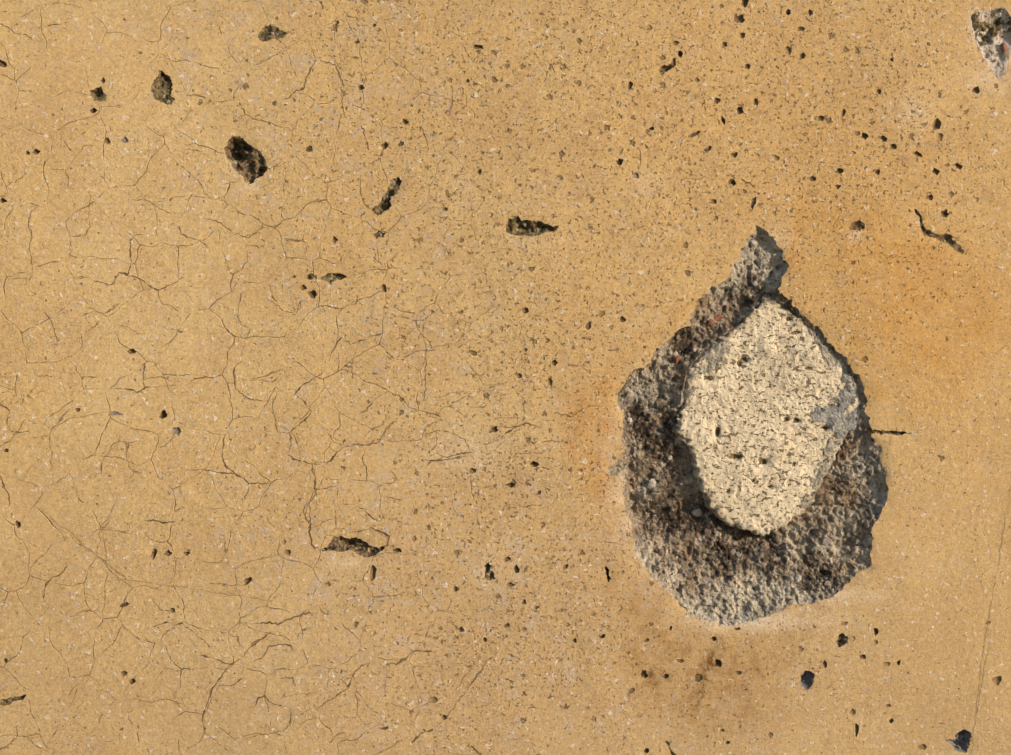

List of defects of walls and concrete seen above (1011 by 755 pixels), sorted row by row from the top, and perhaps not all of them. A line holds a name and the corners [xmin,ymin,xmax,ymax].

crack [283,43,369,150]
peeling [969,7,1011,80]
spalling [224,136,268,184]
crack [0,207,43,281]
crack [914,209,964,254]
crack [76,234,206,404]
crack [0,375,69,506]
crack [93,435,141,475]
crack [132,194,597,552]
spalling [606,225,889,626]
spalling [321,536,385,557]
crack [41,510,498,755]